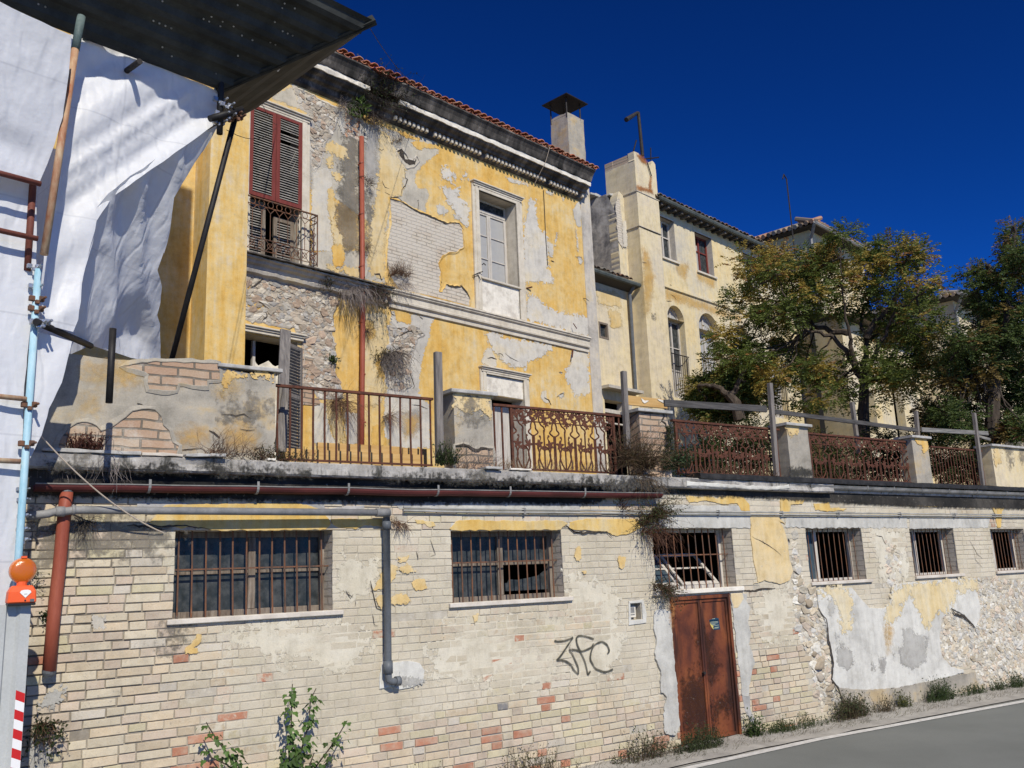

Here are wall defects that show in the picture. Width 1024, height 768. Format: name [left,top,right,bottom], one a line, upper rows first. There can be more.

flaking render [272,84,471,307]
peeling [505,177,589,336]
flaking render [53,358,275,454]
flaking render [481,332,555,372]
flaking render [541,350,591,405]
flaking render [869,527,1024,689]
rust [680,630,732,731]